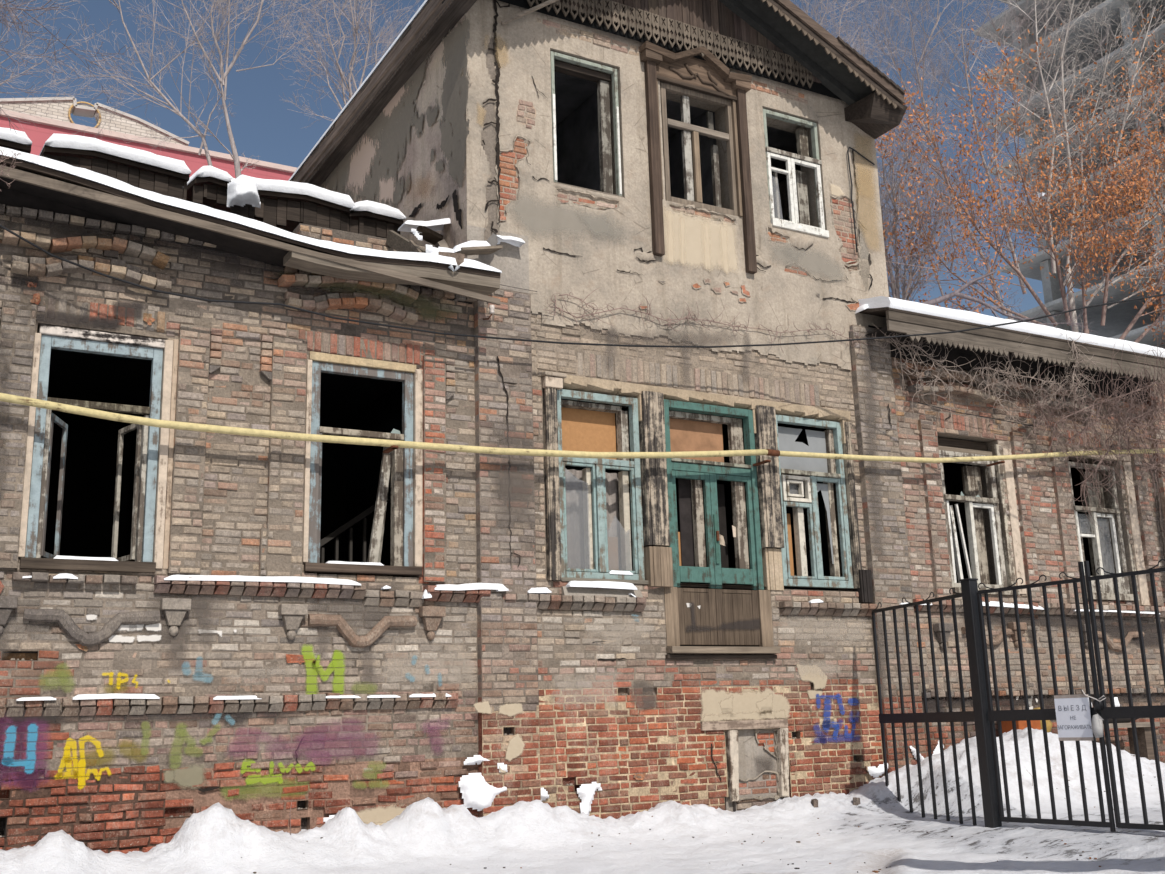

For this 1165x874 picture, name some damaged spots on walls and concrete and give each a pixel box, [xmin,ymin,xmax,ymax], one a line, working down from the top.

peeling [320,15,536,246]
crack [409,189,462,230]
crack [491,0,549,233]
spalling [830,184,873,311]
crack [497,356,520,575]